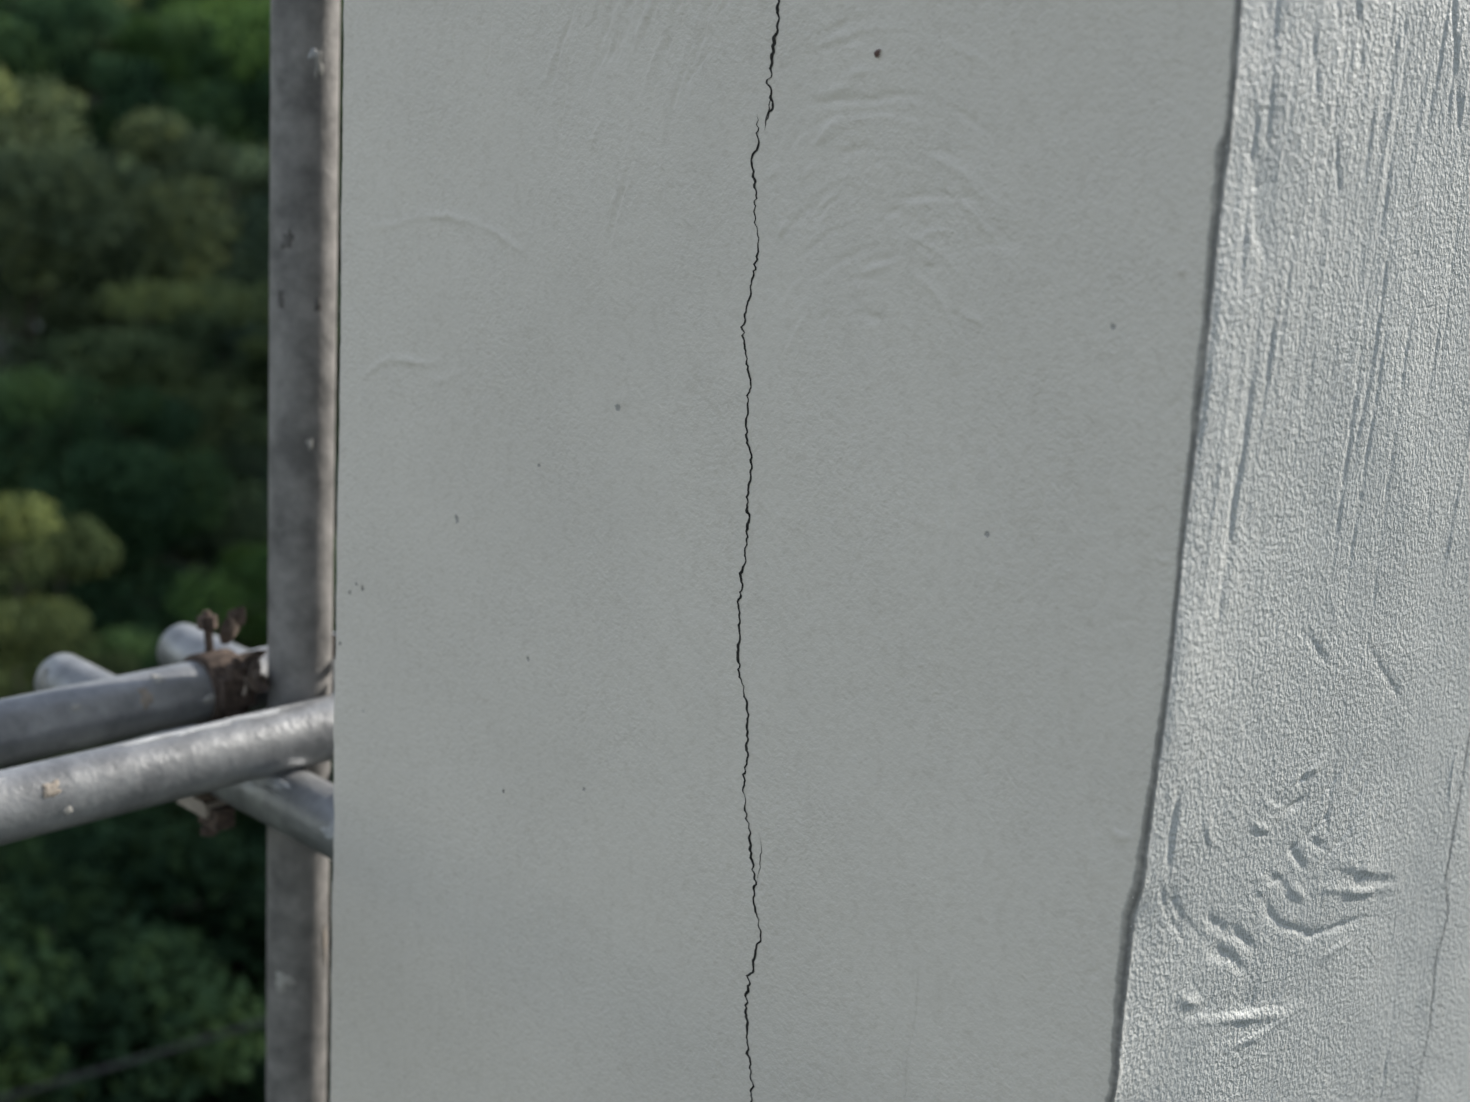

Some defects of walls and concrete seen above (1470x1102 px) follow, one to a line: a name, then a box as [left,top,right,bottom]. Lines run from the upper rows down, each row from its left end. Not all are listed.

crack [736,0,780,1102]